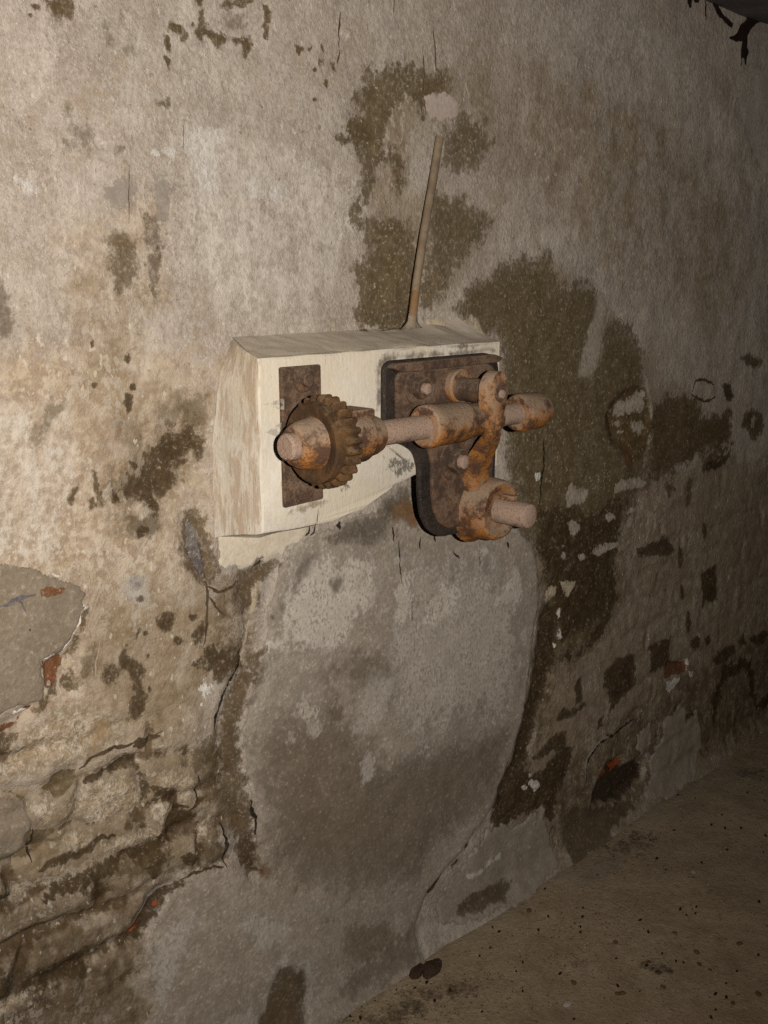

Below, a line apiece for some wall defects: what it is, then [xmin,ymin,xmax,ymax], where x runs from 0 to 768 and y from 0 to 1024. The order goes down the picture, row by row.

leakage [335,60,495,329]
peeling [41,587,65,598]
crack [203,572,236,646]
leakage [0,253,768,900]
flaking render [42,653,62,688]
crack [214,649,240,730]
flaking render [0,705,31,756]
spalling [165,794,207,834]
crack [249,800,257,835]
leakage [0,864,74,913]
flaking render [126,880,185,940]
leakage [0,945,98,1017]